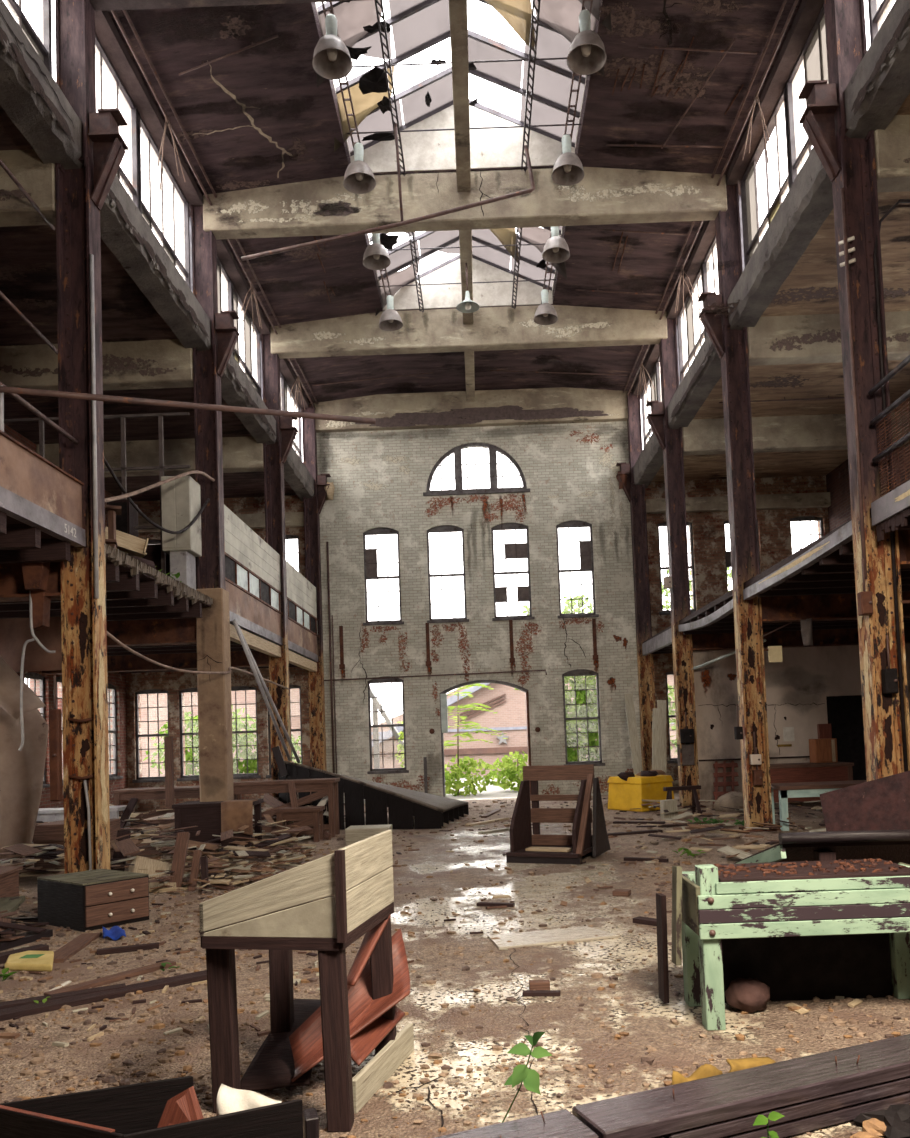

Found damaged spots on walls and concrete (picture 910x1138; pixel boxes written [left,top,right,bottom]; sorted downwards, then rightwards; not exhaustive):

crack [193,64,293,178]
flaking render [313,201,360,216]
flaking render [352,405,613,452]
rust [482,496,503,527]